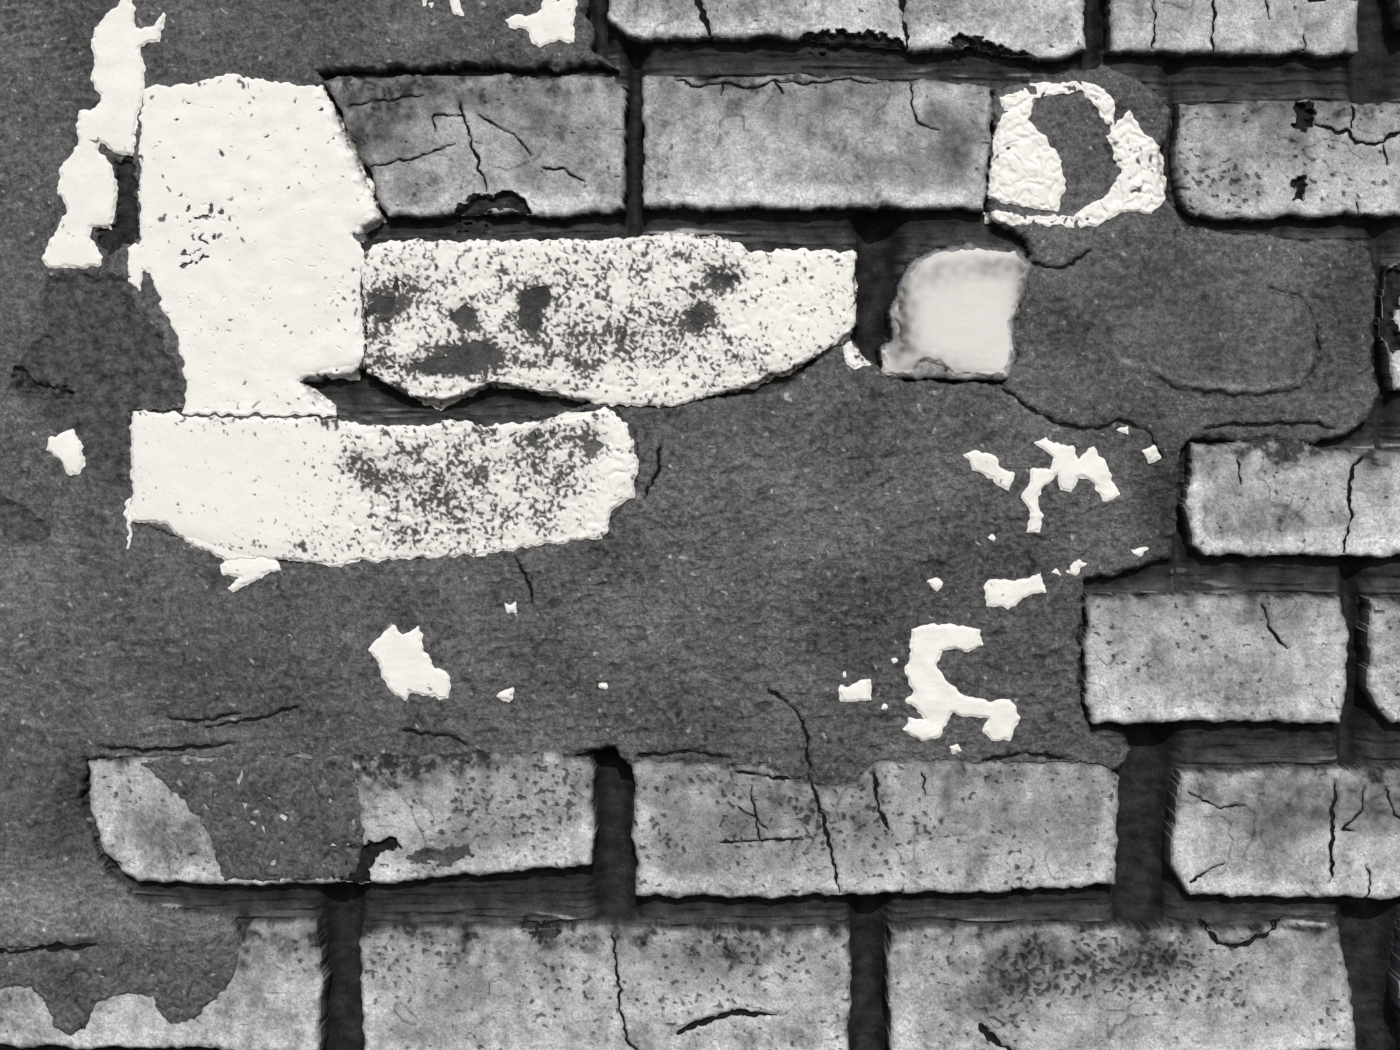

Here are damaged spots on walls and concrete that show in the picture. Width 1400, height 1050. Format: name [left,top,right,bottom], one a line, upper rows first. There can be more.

crack [1150,0,1158,47]
crack [1209,0,1217,57]
crack [348,95,586,192]
peeling [948,32,1167,228]
peeling [0,0,1027,592]
peeling [963,437,1120,533]
peeling [984,559,1087,609]
peeling [368,625,451,701]
peeling [891,623,1020,755]
crack [637,687,841,894]
crack [1189,864,1224,883]
crack [1329,781,1400,897]